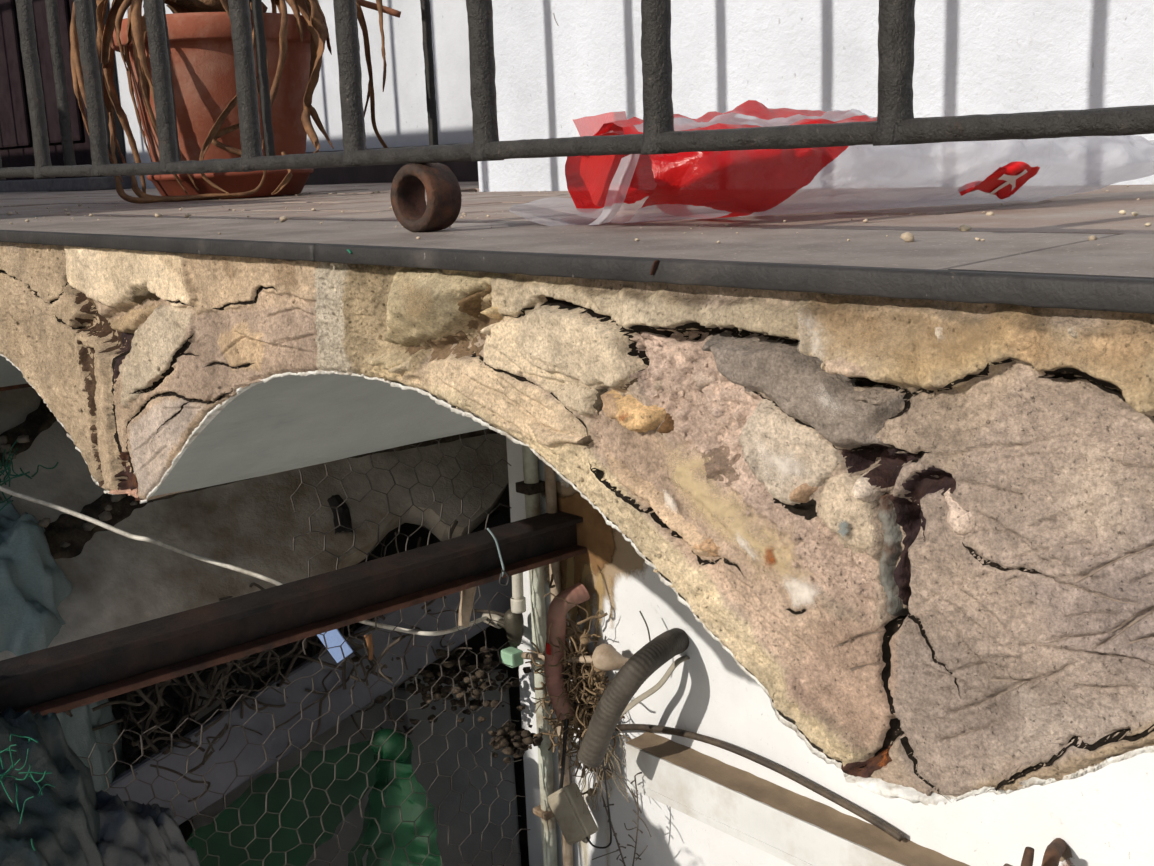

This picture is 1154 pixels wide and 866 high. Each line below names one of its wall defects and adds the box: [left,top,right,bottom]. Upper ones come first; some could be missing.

spalling [71,288,161,488]
crack [111,335,254,483]
crack [166,286,282,310]
spalling [366,300,503,374]
crack [471,351,743,575]
spalling [516,305,956,616]
crack [503,297,1016,463]
crack [1038,368,1126,402]
peeling [845,748,956,805]
crack [859,587,960,798]
peeling [1019,777,1052,788]
crack [986,724,1154,793]